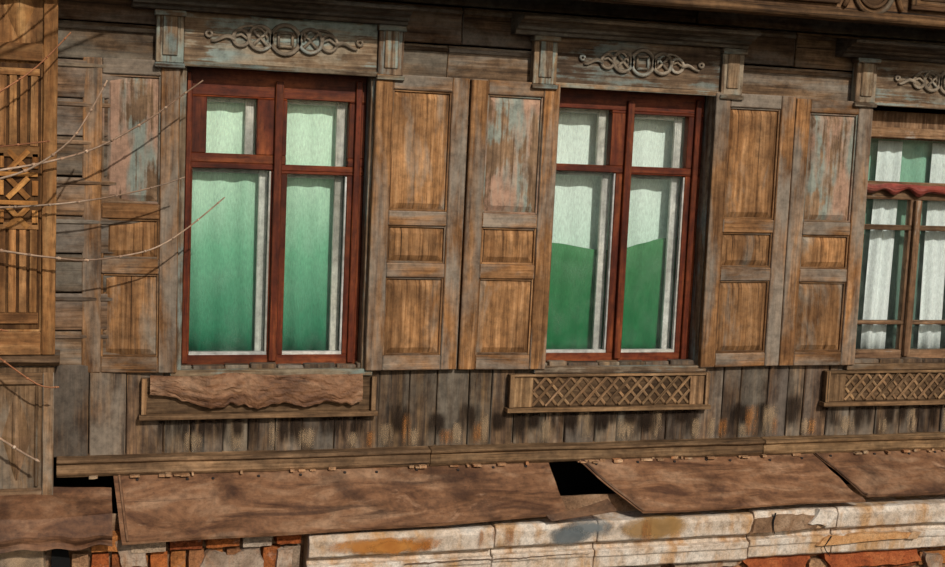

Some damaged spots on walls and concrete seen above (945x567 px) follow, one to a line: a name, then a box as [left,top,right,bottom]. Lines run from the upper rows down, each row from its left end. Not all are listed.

flaking render [633,508,943,567]
flaking render [115,540,148,567]
flaking render [200,546,293,567]